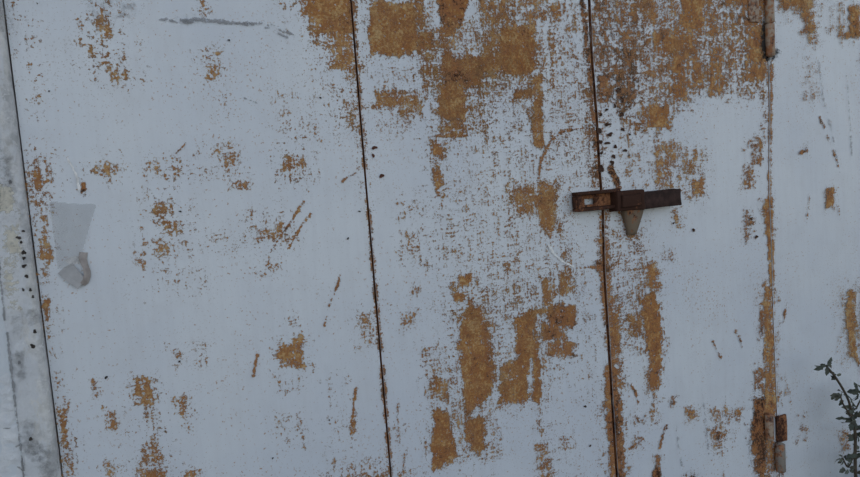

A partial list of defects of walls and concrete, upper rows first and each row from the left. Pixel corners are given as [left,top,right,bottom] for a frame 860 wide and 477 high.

rust [72,0,144,91]
rust [194,44,229,116]
peeling [3,224,34,309]
rust [22,136,128,361]
rust [133,139,312,297]
rust [267,0,860,477]
rust [54,372,78,477]
rust [89,372,206,477]